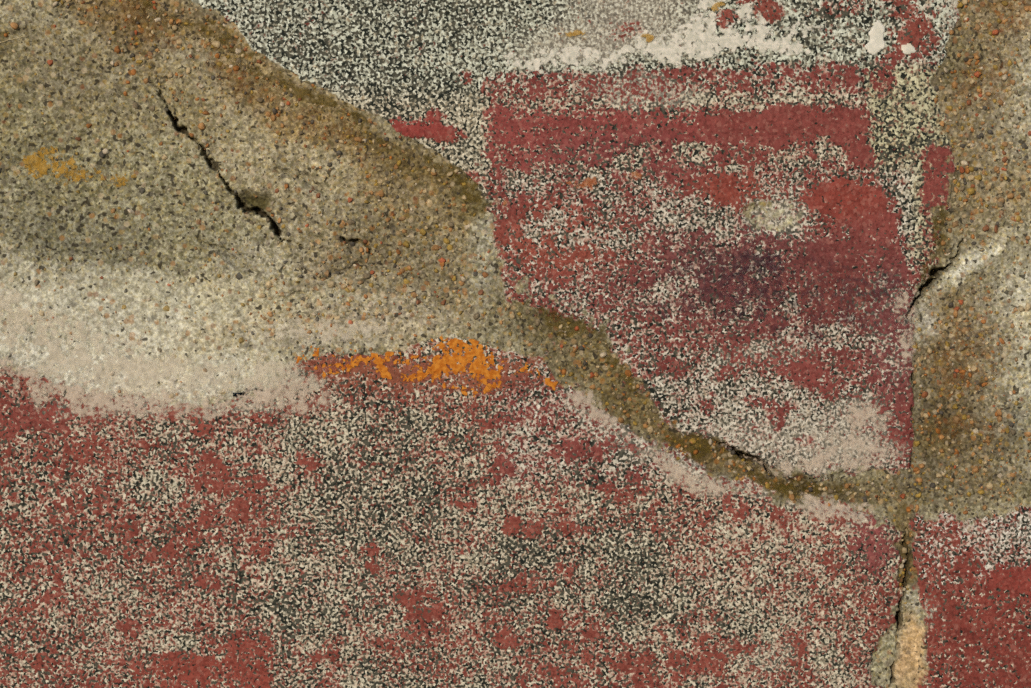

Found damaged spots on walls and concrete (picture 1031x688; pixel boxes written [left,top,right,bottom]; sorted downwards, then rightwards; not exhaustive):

crack [150,83,371,301]
crack [906,239,965,319]
crack [712,439,816,481]
crack [909,373,917,471]
crack [889,528,911,687]